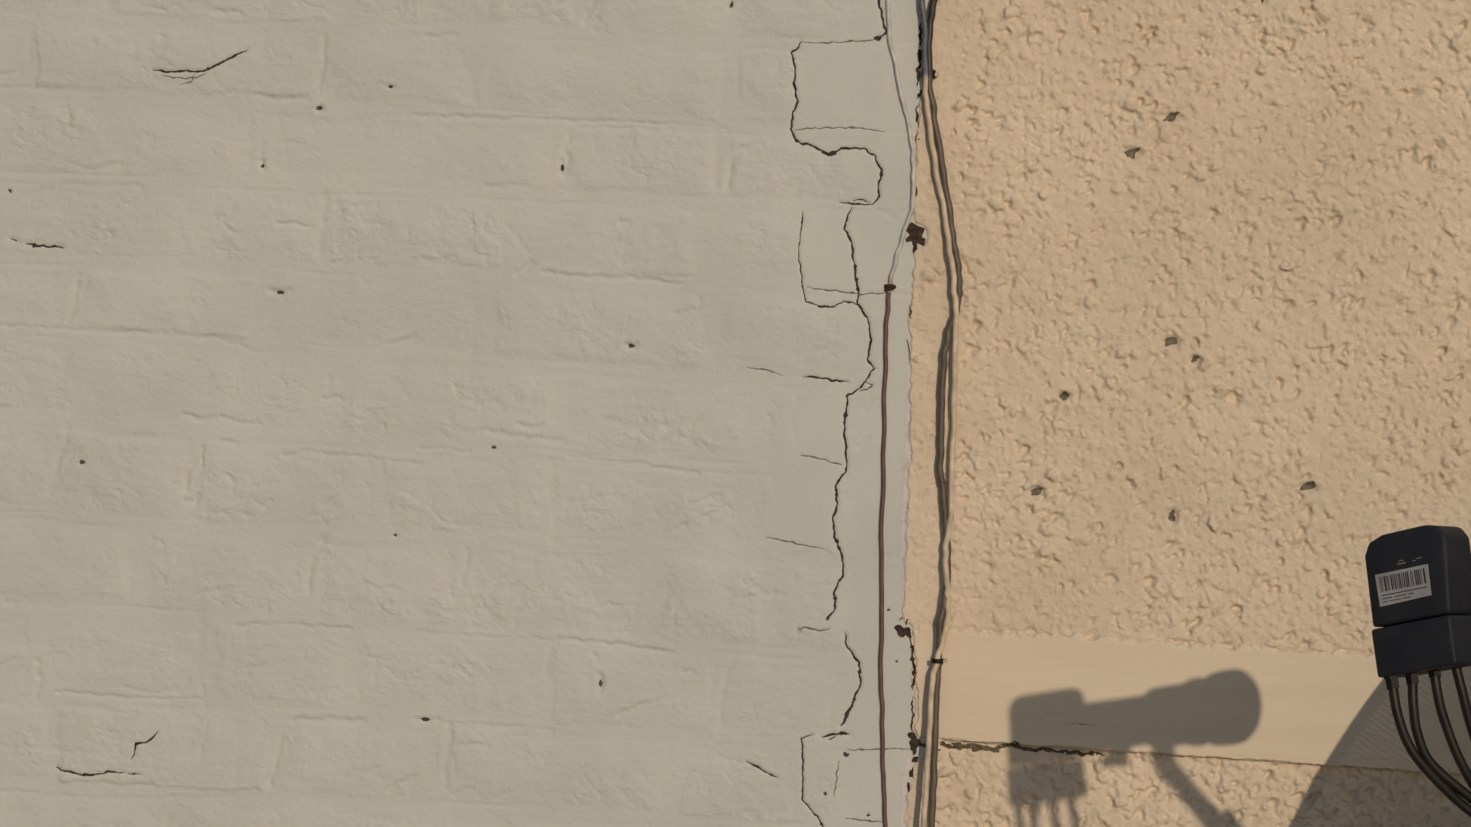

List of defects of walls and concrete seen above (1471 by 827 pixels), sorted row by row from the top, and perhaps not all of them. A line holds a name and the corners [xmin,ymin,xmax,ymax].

crack [154,50,247,85]
spalling [915,0,929,142]
spalling [906,222,926,253]
peeling [887,379,921,827]
crack [56,732,158,777]